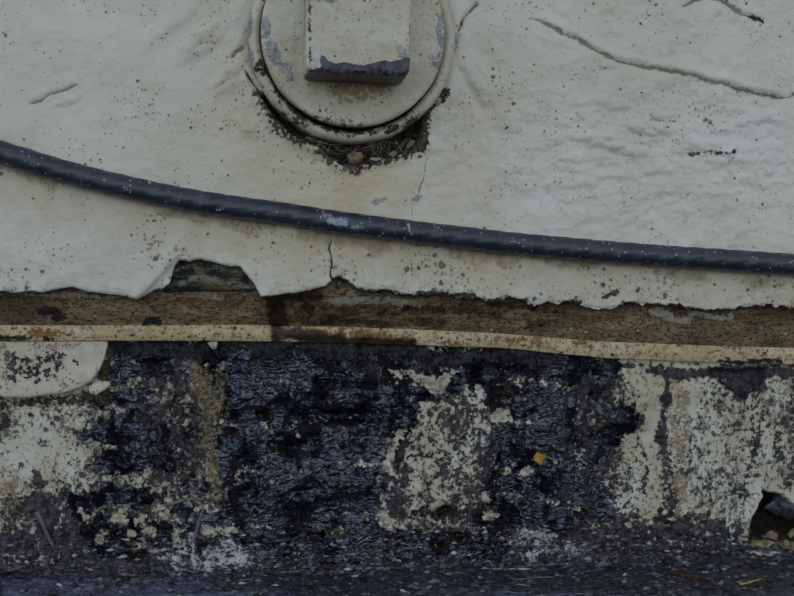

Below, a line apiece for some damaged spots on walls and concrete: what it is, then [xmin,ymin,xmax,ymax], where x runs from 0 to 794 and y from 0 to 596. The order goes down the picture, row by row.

crack [719,0,764,24]
crack [530,18,794,99]
spalling [252,90,431,176]
spalling [132,241,258,302]
spalling [322,277,529,304]
spalling [601,289,636,304]
peeling [0,341,110,398]
leakage [64,289,681,573]
leakage [729,394,764,505]
leakage [772,432,794,491]
spalling [730,490,794,557]